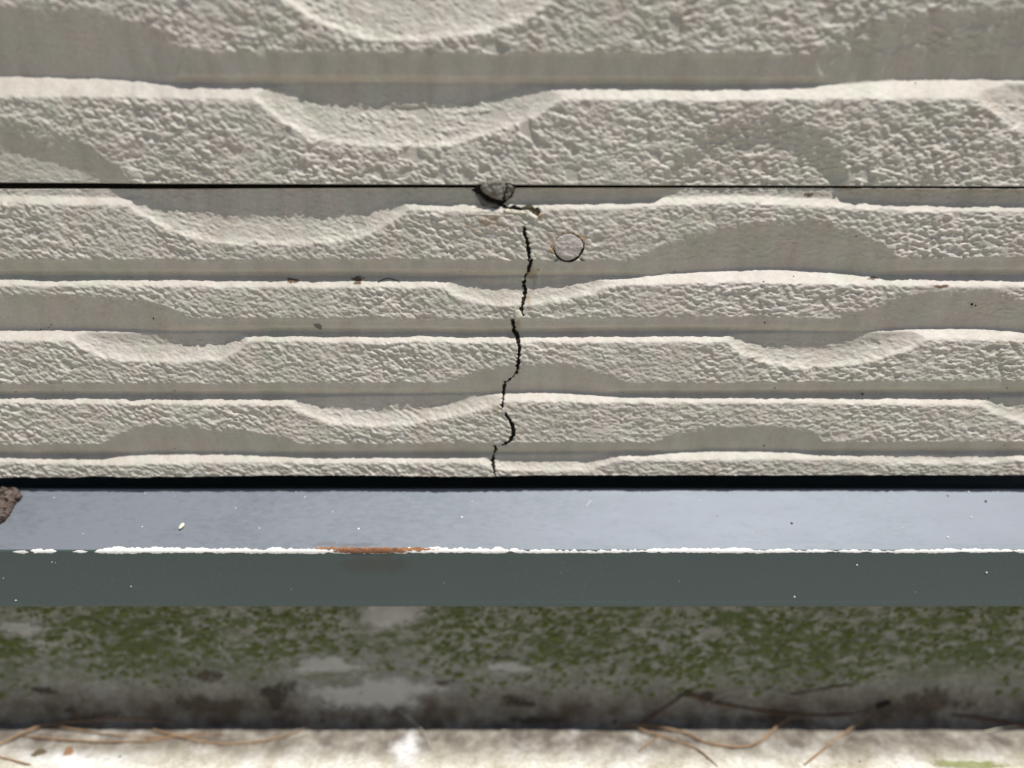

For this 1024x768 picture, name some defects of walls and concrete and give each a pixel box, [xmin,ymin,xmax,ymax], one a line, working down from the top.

spalling [464,179,543,234]
crack [490,227,585,478]
rust [314,546,435,554]
water stain [176,696,254,712]
water stain [503,695,564,725]